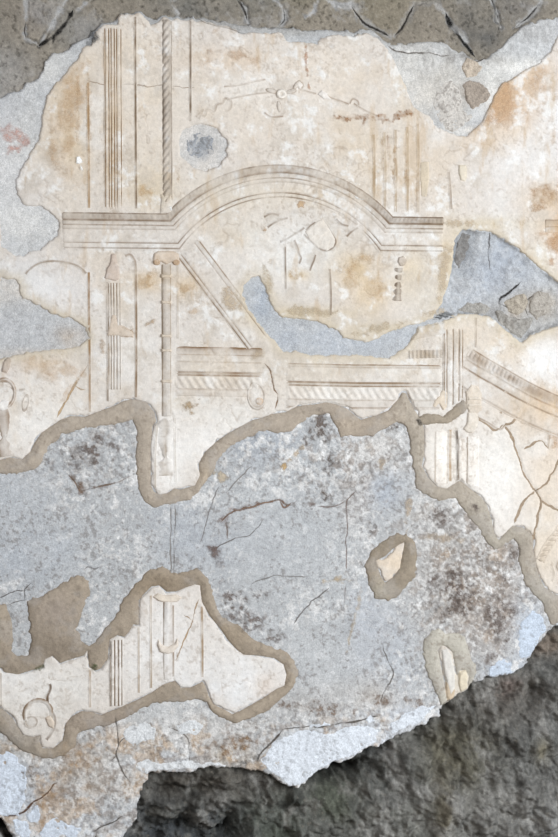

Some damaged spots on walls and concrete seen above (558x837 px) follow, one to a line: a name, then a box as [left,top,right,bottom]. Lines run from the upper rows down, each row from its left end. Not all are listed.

crack [24,10,73,47]
crack [352,7,483,62]
spalling [356,17,558,137]
spalling [0,277,89,359]
spalling [242,229,558,358]
crack [200,467,291,547]
crack [479,417,558,540]
spalling [0,413,558,837]